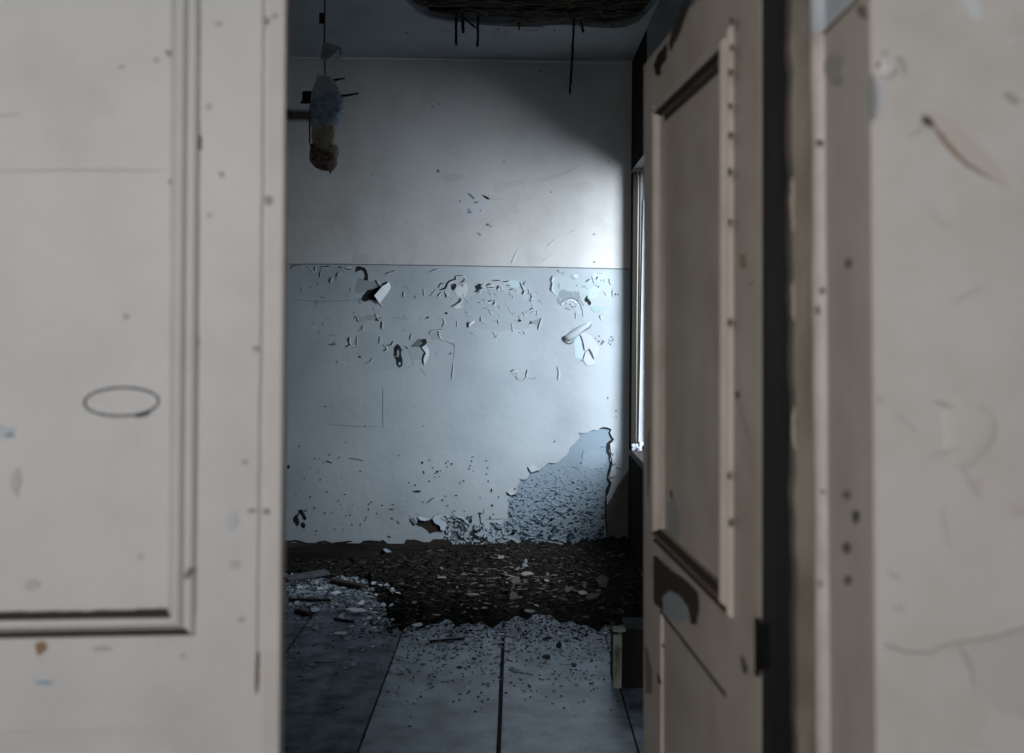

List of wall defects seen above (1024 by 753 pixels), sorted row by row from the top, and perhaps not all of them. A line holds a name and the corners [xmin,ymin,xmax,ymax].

peeling [346,266,380,302]
peeling [445,280,540,331]
peeling [552,272,619,365]
peeling [394,331,441,367]
spalling [404,429,617,545]
peeling [293,510,307,528]